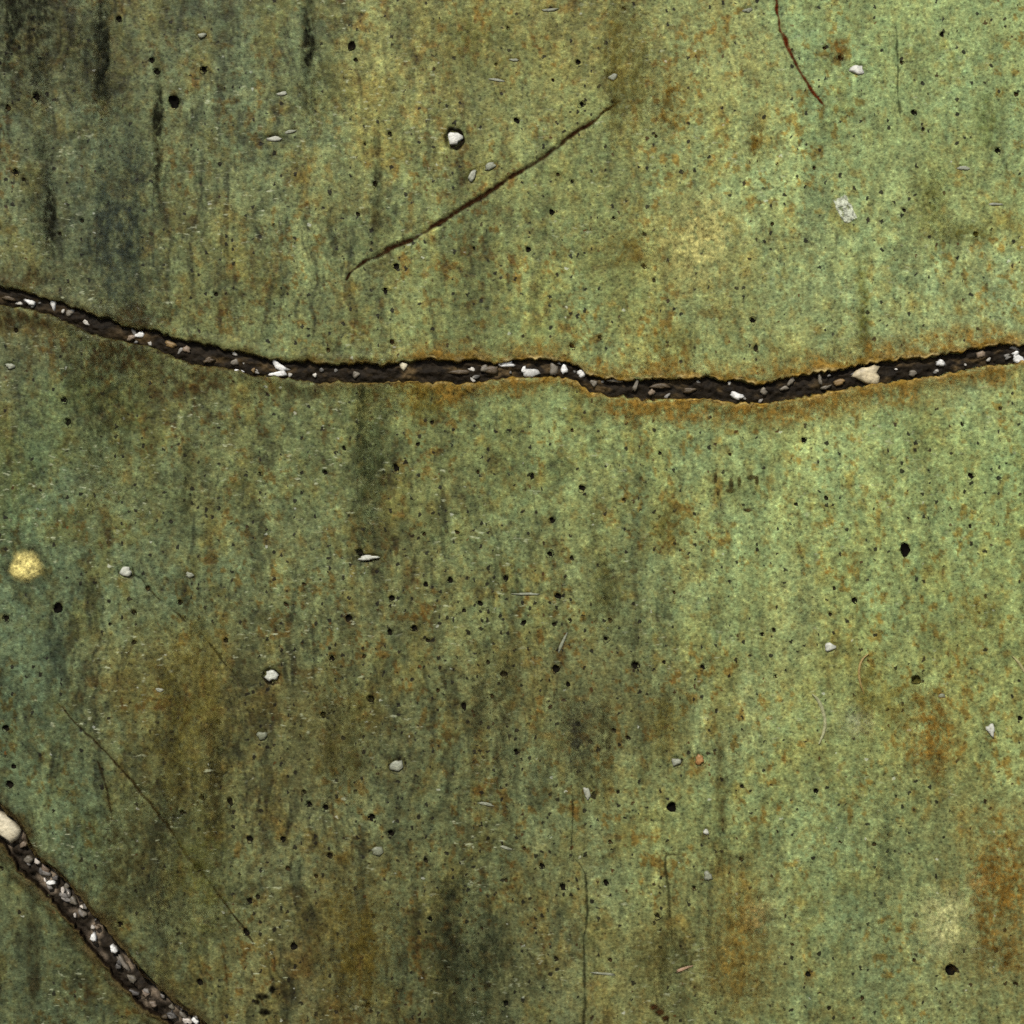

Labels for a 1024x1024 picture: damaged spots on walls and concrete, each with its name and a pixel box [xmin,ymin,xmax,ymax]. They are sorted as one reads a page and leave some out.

leakage [0,0,54,70]
leakage [96,12,109,96]
leakage [153,89,162,189]
leakage [44,188,55,249]
crack [345,100,620,280]
crack [0,271,1024,422]
crack [0,803,208,1024]